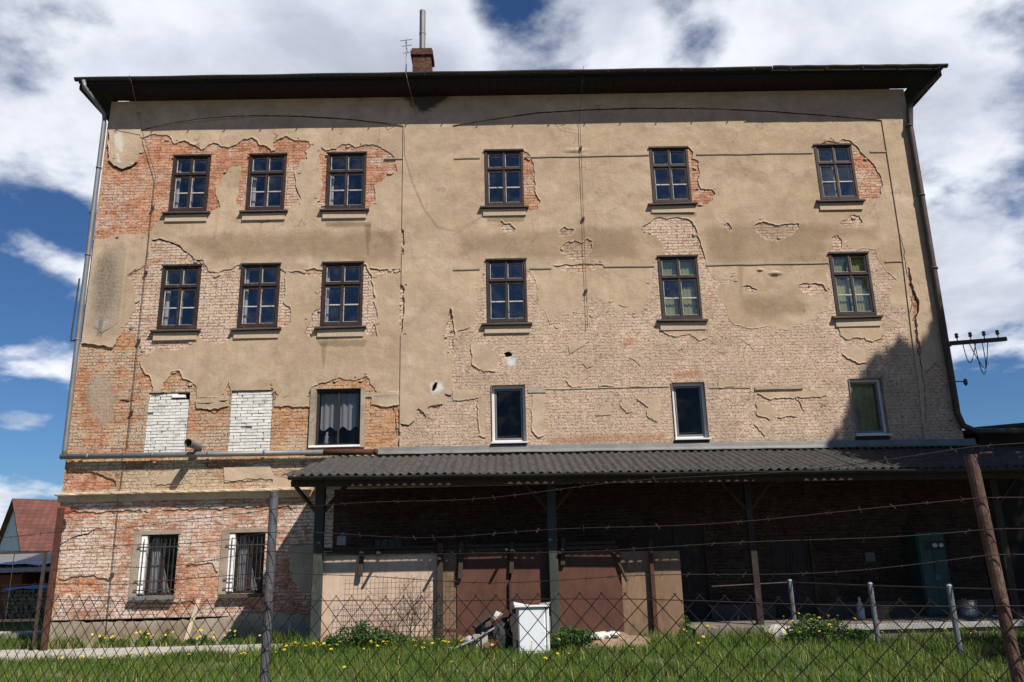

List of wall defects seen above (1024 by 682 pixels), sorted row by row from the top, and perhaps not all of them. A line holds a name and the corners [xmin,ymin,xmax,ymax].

flaking render [64,131,397,491]
flaking render [266,138,964,459]
crack [899,234,926,421]